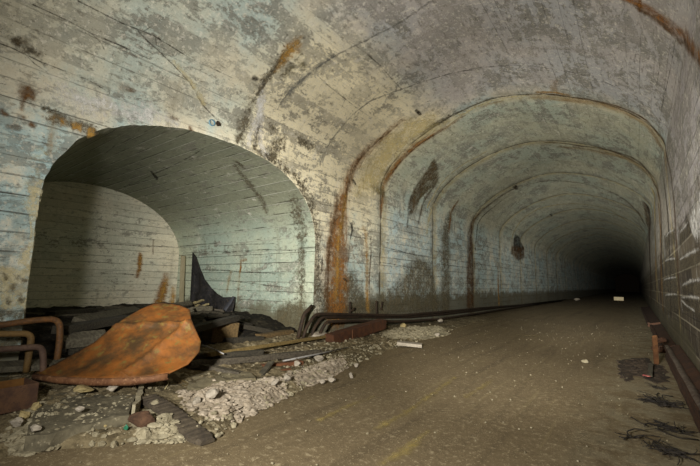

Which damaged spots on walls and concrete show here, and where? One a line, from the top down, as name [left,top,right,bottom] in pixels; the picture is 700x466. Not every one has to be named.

spalling [11,38,41,56]
rust [625,0,700,64]
rust [21,86,35,107]
leakage [407,152,485,226]
rust [155,276,175,303]
rust [327,153,365,327]
leakage [316,205,455,319]
rust [467,200,495,313]
leakage [511,204,558,260]